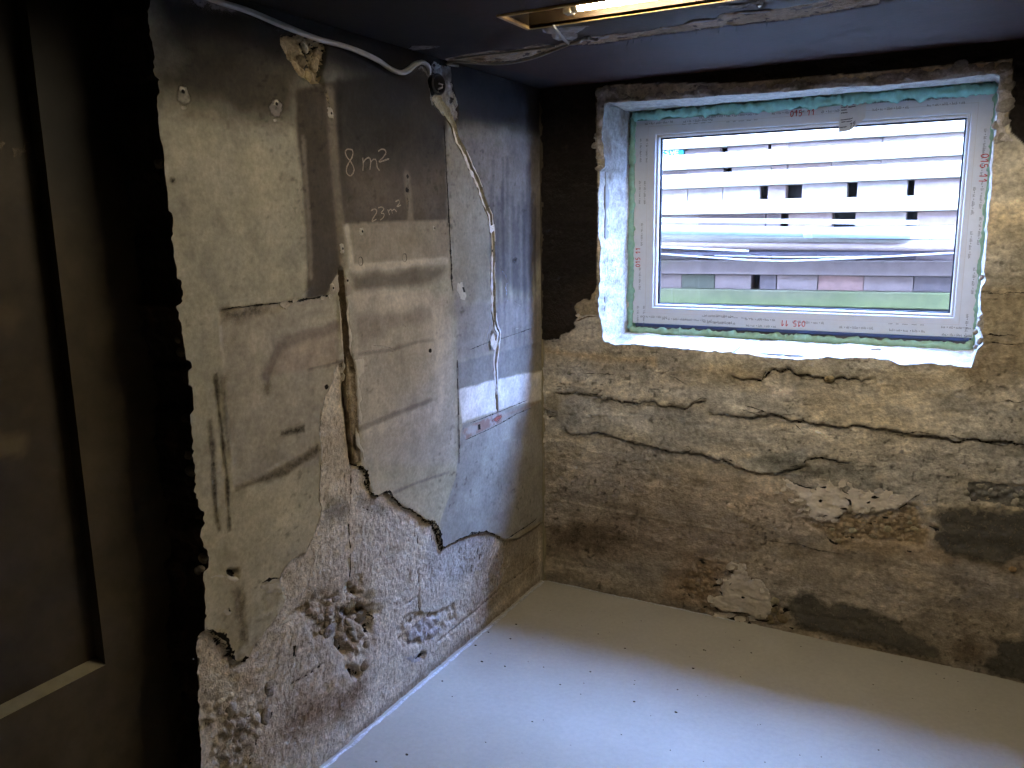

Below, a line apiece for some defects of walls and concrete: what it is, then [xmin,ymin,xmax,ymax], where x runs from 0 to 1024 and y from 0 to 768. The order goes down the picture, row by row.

spalling [276,26,329,102]
spalling [542,26,588,41]
spalling [575,284,599,321]
crack [457,326,1023,486]
spalling [196,275,542,768]
spalling [774,479,939,552]
spalling [963,481,1024,509]
peeling [675,559,794,630]